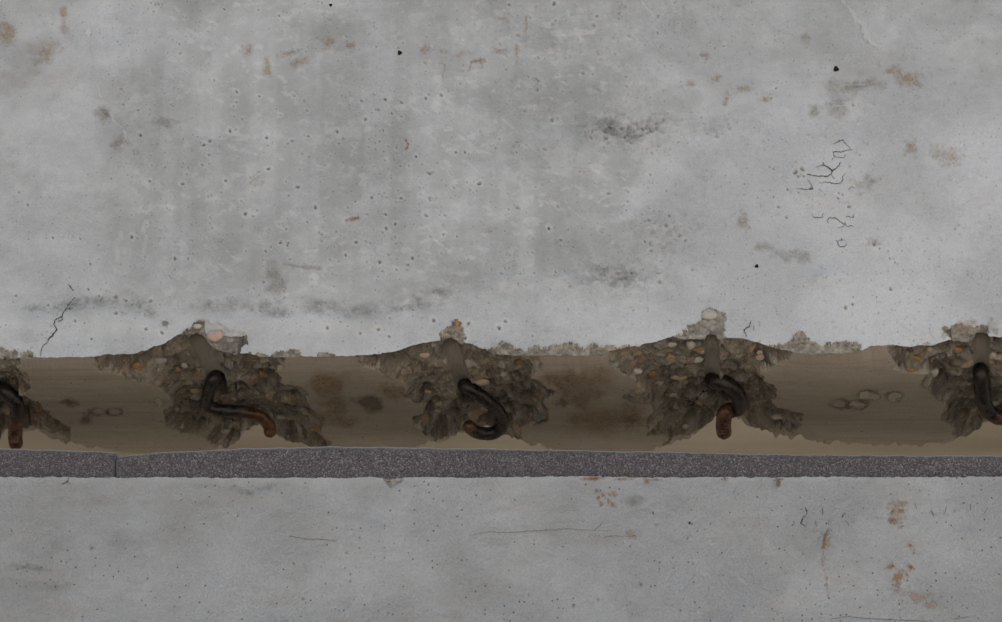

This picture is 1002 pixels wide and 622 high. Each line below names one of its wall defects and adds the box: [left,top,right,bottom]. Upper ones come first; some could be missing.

crack [804,139,855,190]
crack [813,213,854,247]
crack [40,284,75,355]
spalling [0,346,71,439]
spalling [90,320,332,448]
spalling [356,308,861,447]
spalling [887,323,1002,438]